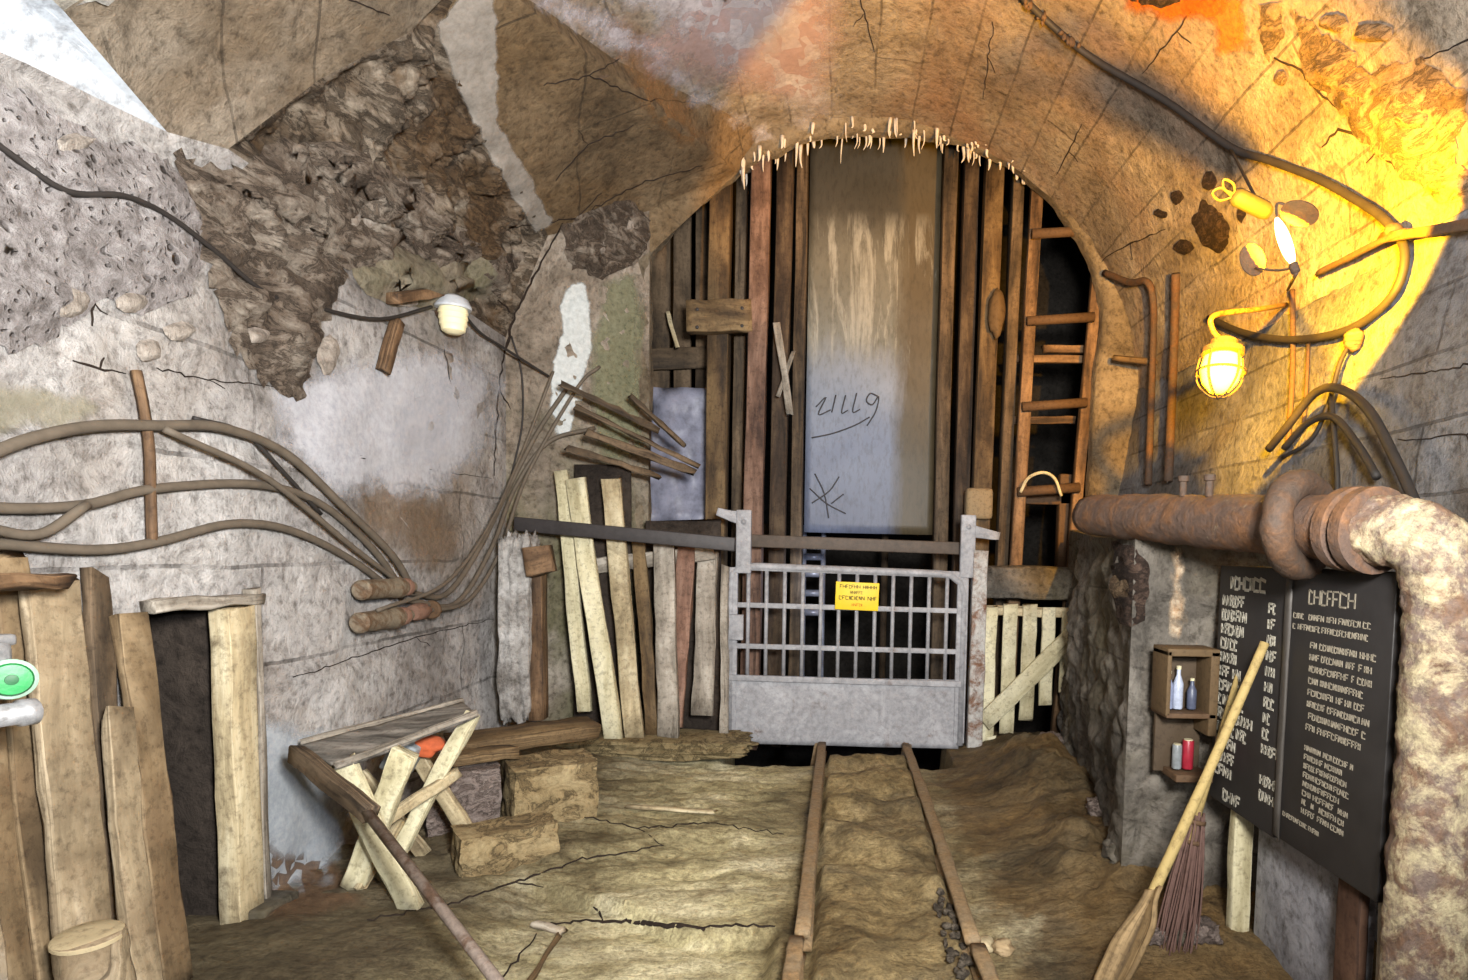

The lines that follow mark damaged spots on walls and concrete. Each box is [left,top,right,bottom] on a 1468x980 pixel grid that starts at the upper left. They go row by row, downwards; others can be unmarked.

crack [349,0,390,16]
spalling [1131,0,1181,9]
spalling [0,83,527,402]